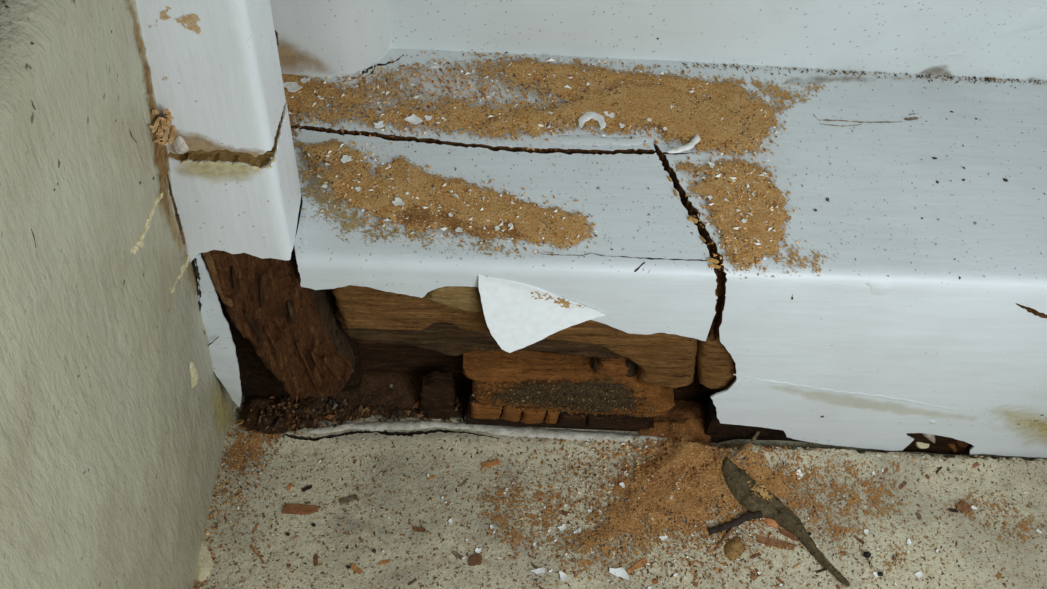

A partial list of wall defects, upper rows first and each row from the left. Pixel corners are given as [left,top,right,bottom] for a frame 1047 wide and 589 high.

crack [544,253,707,261]
peeling [478,275,605,353]
crack [1016,303,1047,318]
peeling [171,253,242,407]
spalling [901,433,974,455]